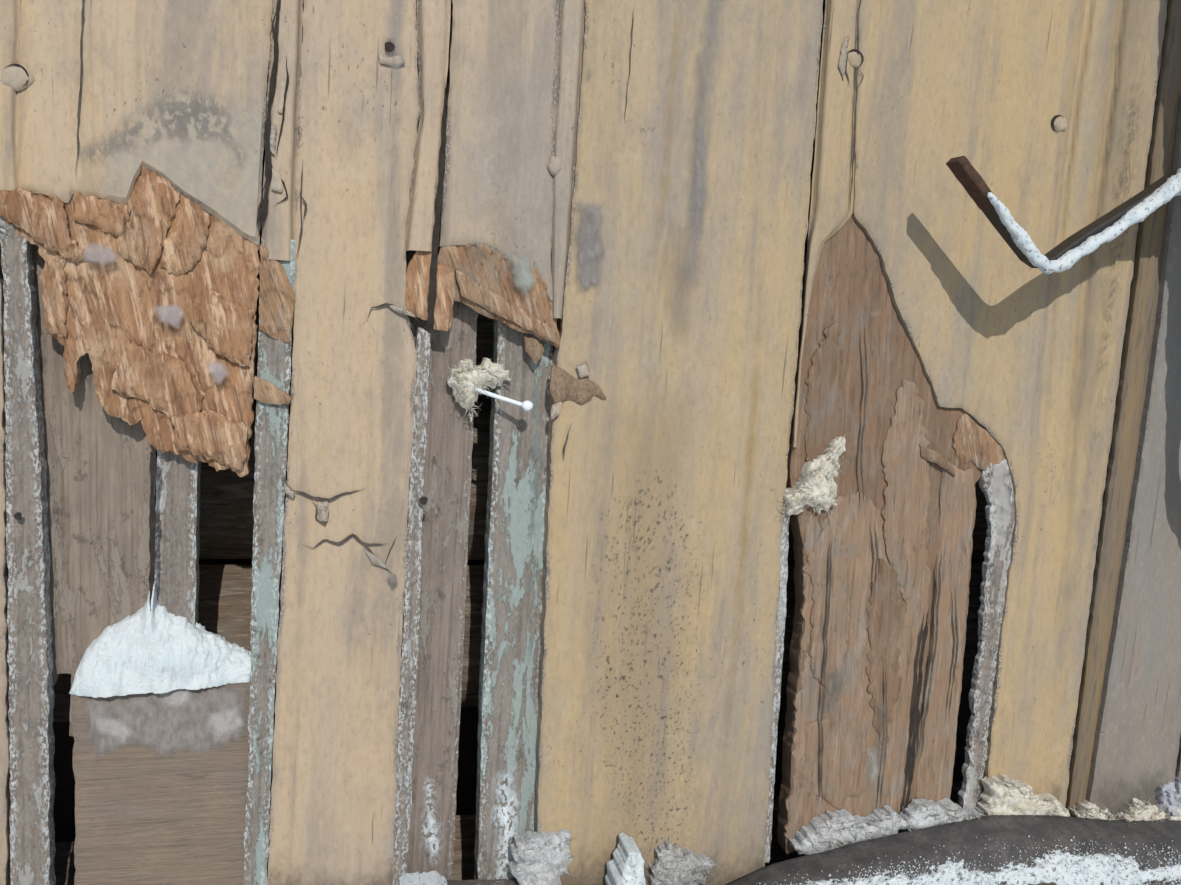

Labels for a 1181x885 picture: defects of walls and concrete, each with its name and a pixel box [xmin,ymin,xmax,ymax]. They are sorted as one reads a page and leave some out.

crack [75,0,84,177]
peeling [111,94,295,344]
peeling [253,376,291,405]
peeling [804,322,843,462]
crack [281,479,397,575]
peeling [801,378,931,810]